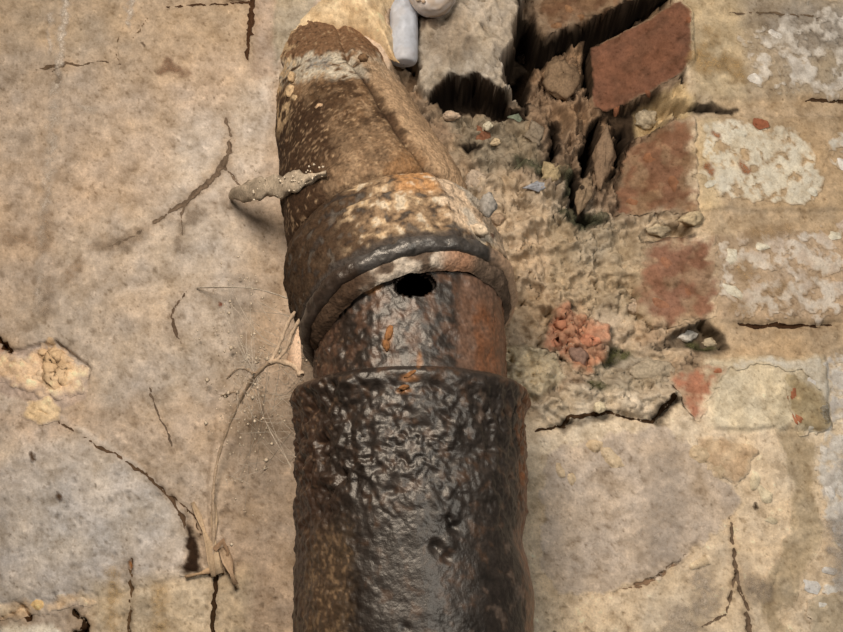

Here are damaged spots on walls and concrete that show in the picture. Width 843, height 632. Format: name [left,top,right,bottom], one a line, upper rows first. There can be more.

spalling [533,0,632,41]
spalling [590,0,693,117]
crack [0,337,13,354]
corrosion [382,325,393,352]
spalling [538,299,612,376]
crack [738,321,832,329]
flaking render [0,342,91,425]
crack [535,393,677,432]
crack [58,421,202,535]
crack [72,609,90,632]
crack [126,558,134,632]
crack [701,517,752,632]